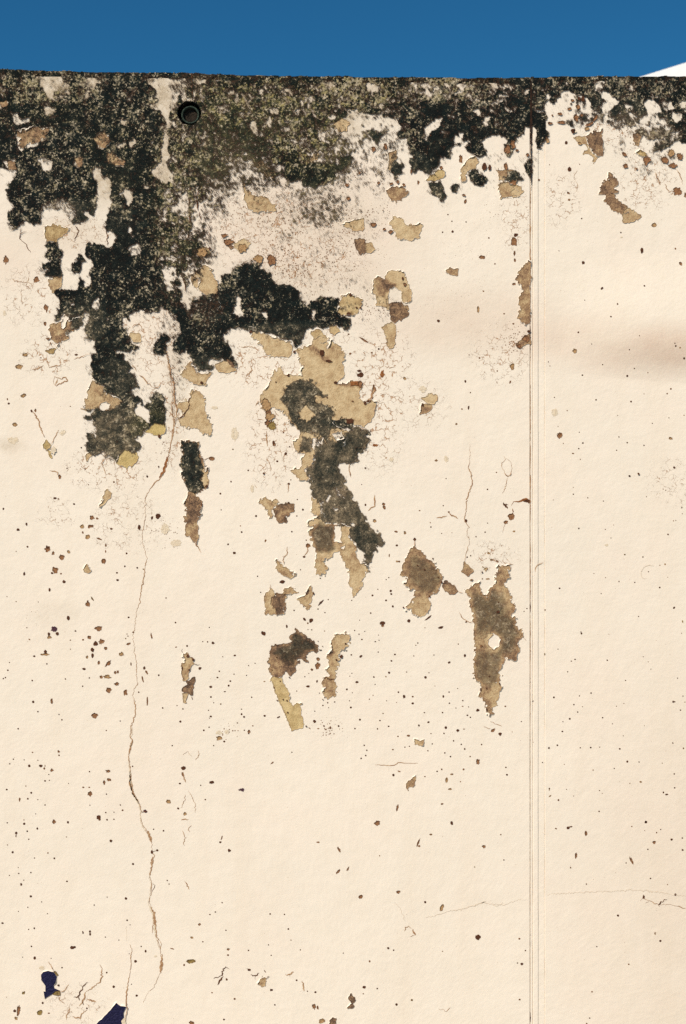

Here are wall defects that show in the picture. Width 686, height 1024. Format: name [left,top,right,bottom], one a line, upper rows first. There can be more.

leakage [0,101,686,461]
peeling [341,143,446,255]
peeling [511,234,533,349]
peeling [598,133,683,227]
peeling [145,359,236,547]
peeling [248,269,413,731]
crack [125,313,178,1020]
peeling [180,652,201,703]
peeling [399,546,524,736]